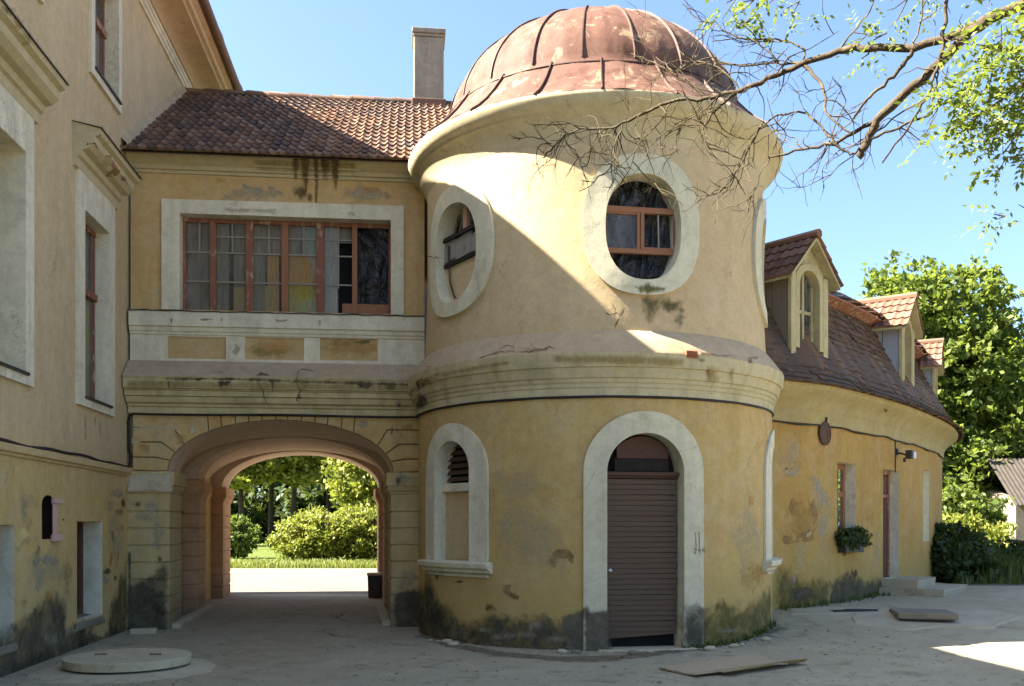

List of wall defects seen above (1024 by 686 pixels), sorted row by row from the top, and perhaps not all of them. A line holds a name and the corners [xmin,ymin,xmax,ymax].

damp [260,158,354,202]
damp [639,284,681,318]
crack [481,343,553,358]
crack [295,368,313,402]
flaking render [550,549,574,567]
damp [0,553,167,678]
damp [395,572,611,651]
damp [680,570,881,648]